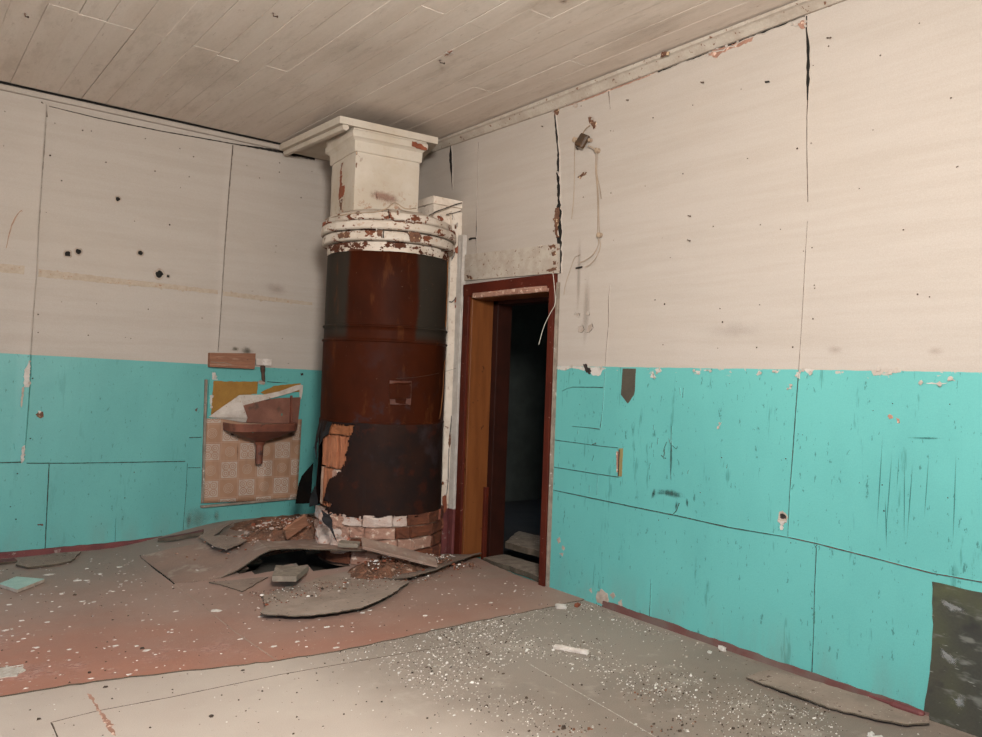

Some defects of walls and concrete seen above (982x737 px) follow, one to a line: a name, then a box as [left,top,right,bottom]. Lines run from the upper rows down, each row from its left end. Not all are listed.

peeling [376,209,422,243]
peeling [537,218,558,272]
crack [553,15,982,672]